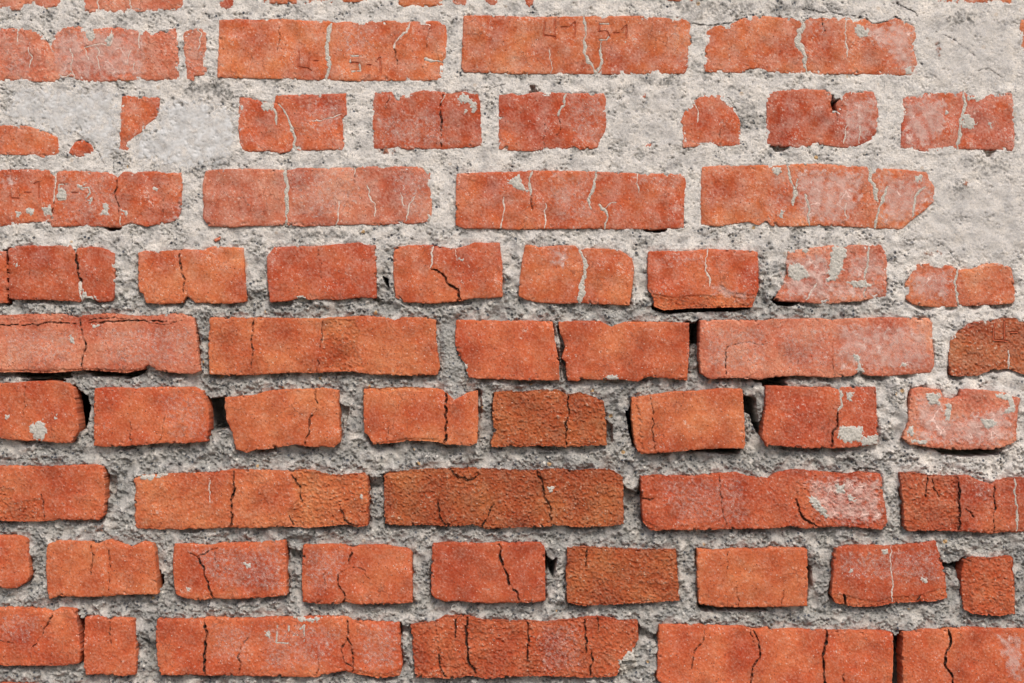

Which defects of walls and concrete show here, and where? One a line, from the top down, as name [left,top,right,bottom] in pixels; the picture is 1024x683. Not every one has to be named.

crack [528,171,547,228]
crack [587,172,639,229]
crack [430,246,461,299]
crack [577,249,589,304]
crack [0,255,176,368]
crack [925,475,1019,533]
crack [482,506,519,600]
crack [198,549,218,675]
crack [438,620,476,677]
crack [822,628,845,683]
crack [944,628,953,683]